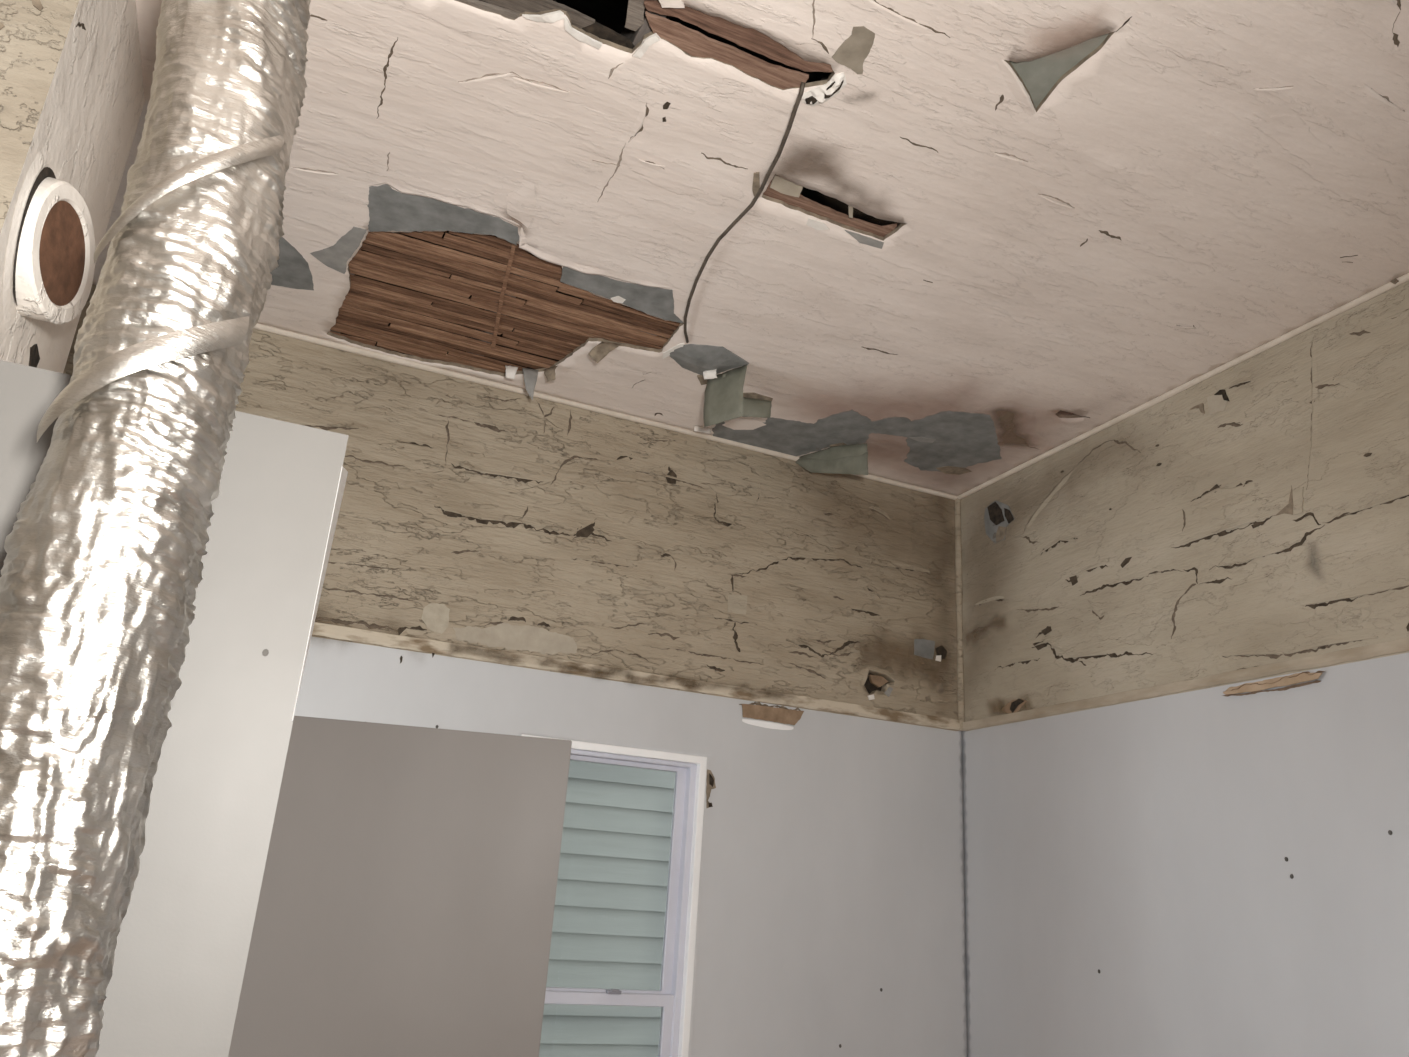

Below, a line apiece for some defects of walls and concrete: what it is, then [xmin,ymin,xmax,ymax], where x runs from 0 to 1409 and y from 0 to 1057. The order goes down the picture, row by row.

crack [377,39,398,118]
spalling [457,0,875,89]
crack [811,0,829,54]
peeling [995,16,1132,116]
crack [593,102,671,201]
crack [702,153,746,169]
flaking render [270,179,1002,475]
crack [271,395,737,570]
crack [966,440,1409,671]
crack [315,557,435,663]
crack [591,551,930,679]
spalling [862,665,896,700]